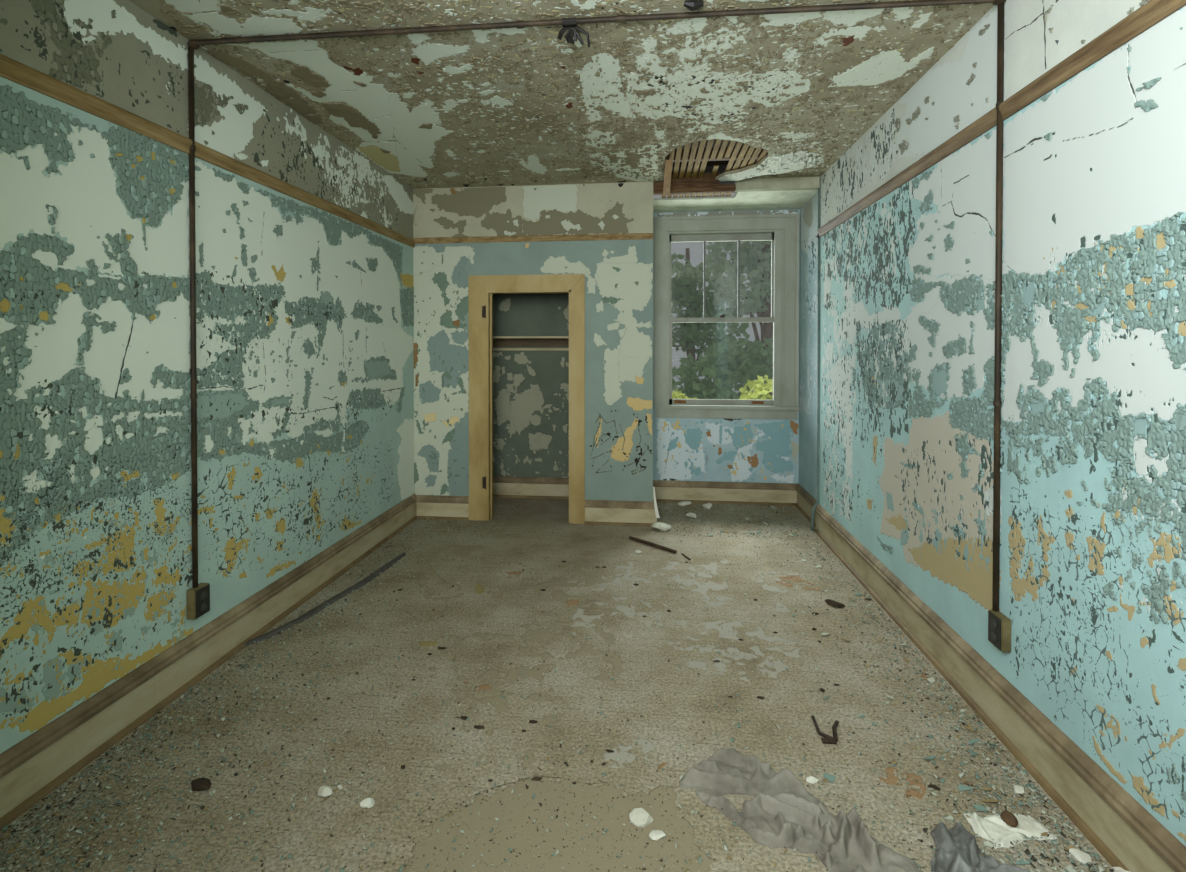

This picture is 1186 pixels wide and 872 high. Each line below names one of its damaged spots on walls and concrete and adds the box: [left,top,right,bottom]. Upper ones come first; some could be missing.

peeling [0,418,1114,872]
flaking render [0,0,1186,649]
crack [856,175,1186,822]
crack [1004,137,1052,161]
crack [1005,0,1058,69]